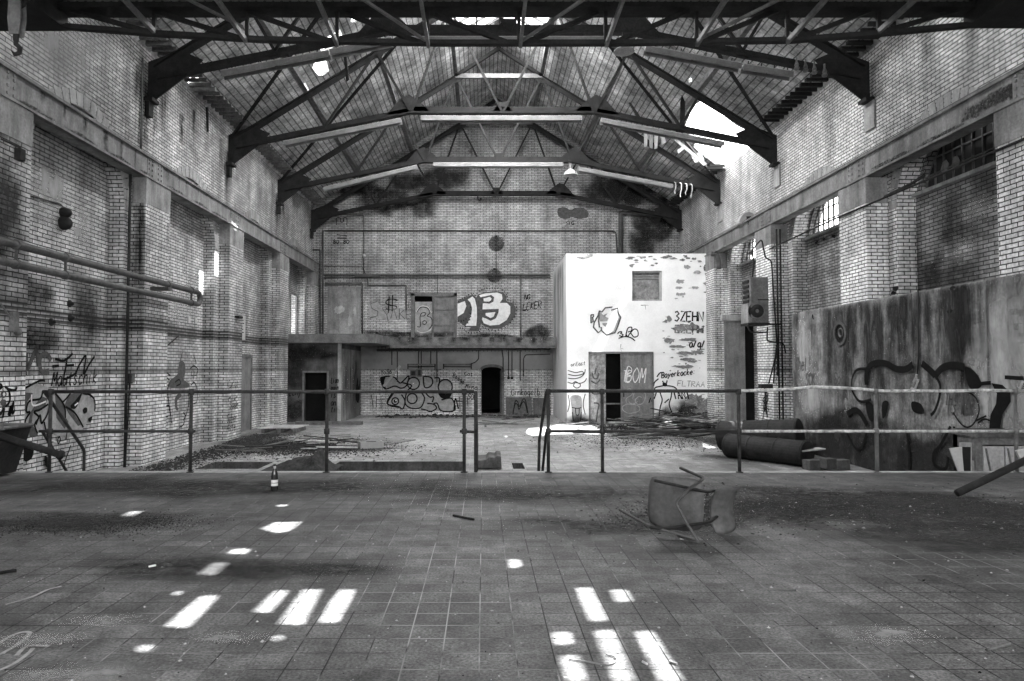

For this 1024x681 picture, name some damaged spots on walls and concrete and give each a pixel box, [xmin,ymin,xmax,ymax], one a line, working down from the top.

water stain [0,161,22,257]
peeling [625,255,706,299]
peeling [663,316,705,371]
water stain [795,286,1024,471]